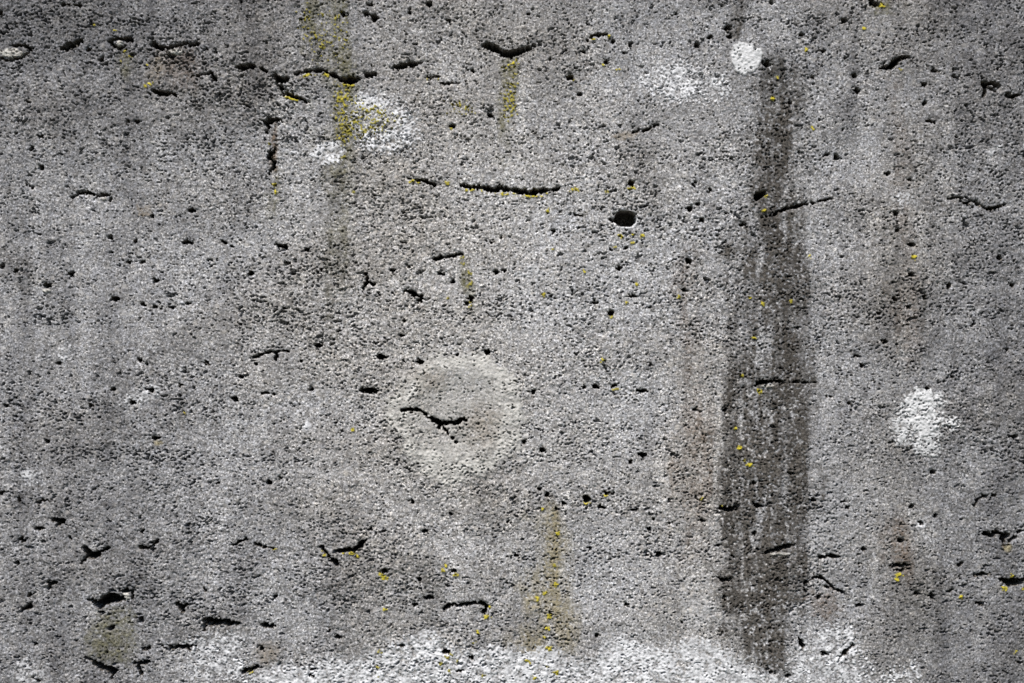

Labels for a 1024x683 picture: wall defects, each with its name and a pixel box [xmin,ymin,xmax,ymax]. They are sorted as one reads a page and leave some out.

crack [406,177,561,196]
water stain [184,57,922,683]
crack [400,407,468,444]